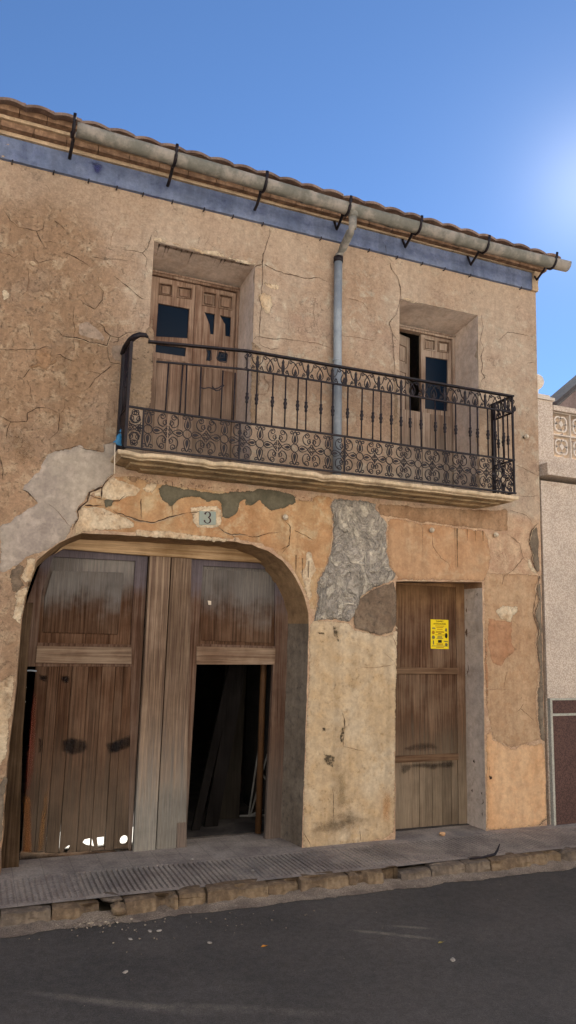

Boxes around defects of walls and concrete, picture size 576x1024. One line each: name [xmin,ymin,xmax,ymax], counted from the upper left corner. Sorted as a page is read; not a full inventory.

crack [253,235,401,366]
crack [0,208,311,552]
peeling [10,558,35,624]
peeling [74,476,228,542]
spalling [528,528,540,573]
peeling [485,605,518,705]